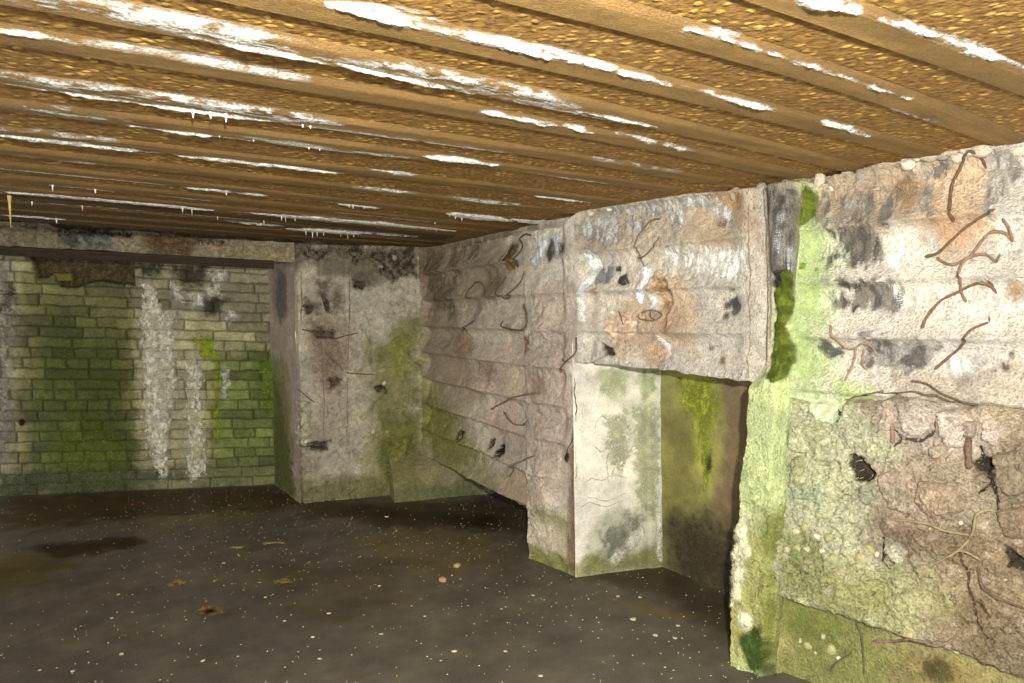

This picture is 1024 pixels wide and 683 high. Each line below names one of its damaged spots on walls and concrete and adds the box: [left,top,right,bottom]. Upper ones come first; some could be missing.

damp [885,21,1024,68]
damp [70,0,692,151]
damp [1,76,410,140]
damp [705,90,771,110]
damp [0,129,149,153]
damp [177,155,344,174]
damp [423,142,499,166]
corrosion [498,244,518,271]
damp [816,185,916,313]
corrosion [1008,282,1024,299]
damp [137,263,237,483]
spalling [772,394,1024,678]